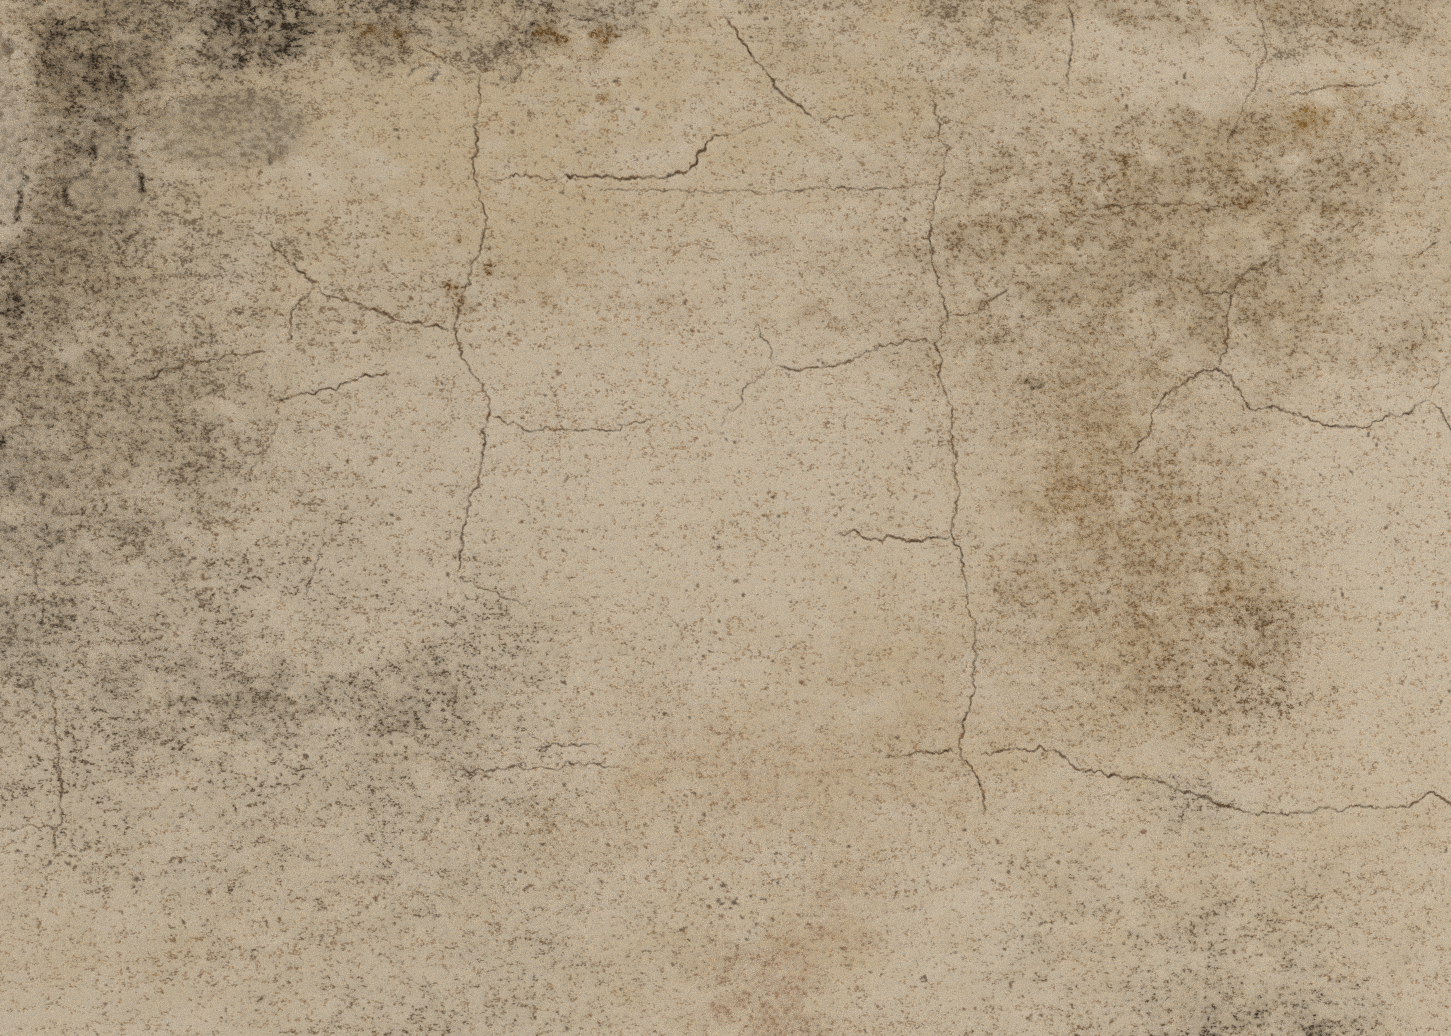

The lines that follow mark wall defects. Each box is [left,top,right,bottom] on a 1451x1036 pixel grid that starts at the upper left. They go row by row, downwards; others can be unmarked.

damp [30,2,129,225]
damp [189,0,329,73]
crack [728,20,853,117]
damp [0,252,31,324]
crack [148,49,720,599]
crack [759,104,1451,816]
damp [1001,377,1316,737]
damp [216,671,287,726]
damp [379,673,457,736]